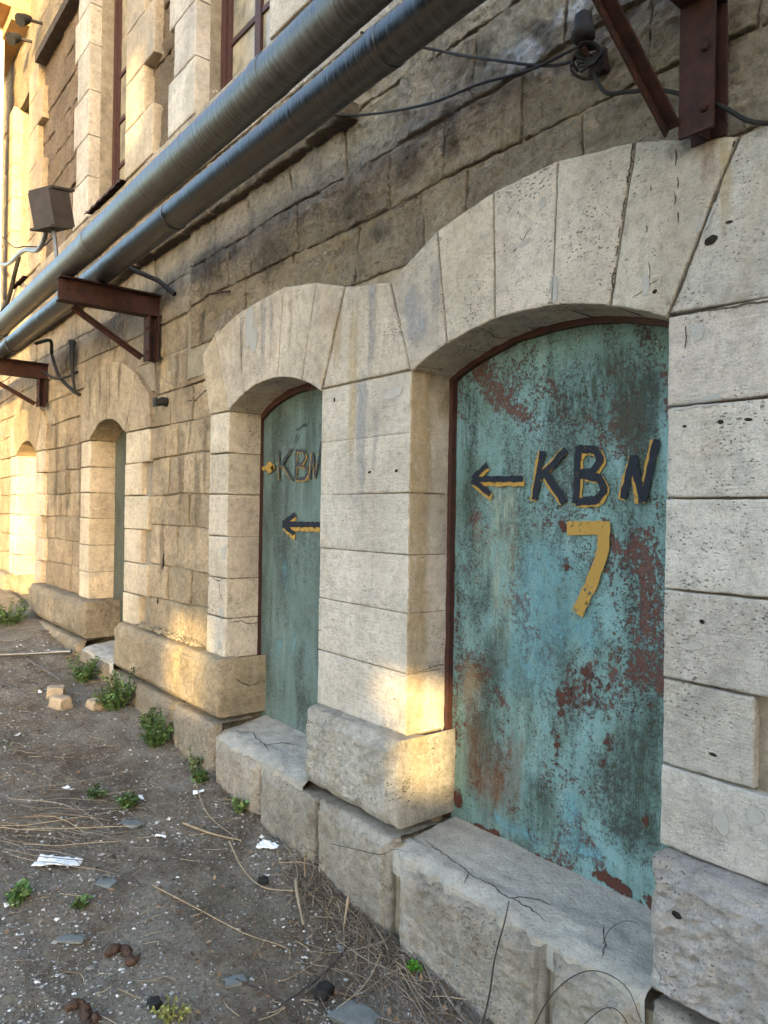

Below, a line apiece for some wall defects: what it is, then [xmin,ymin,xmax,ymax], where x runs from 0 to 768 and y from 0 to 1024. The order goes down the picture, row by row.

crack [425,840,550,920]